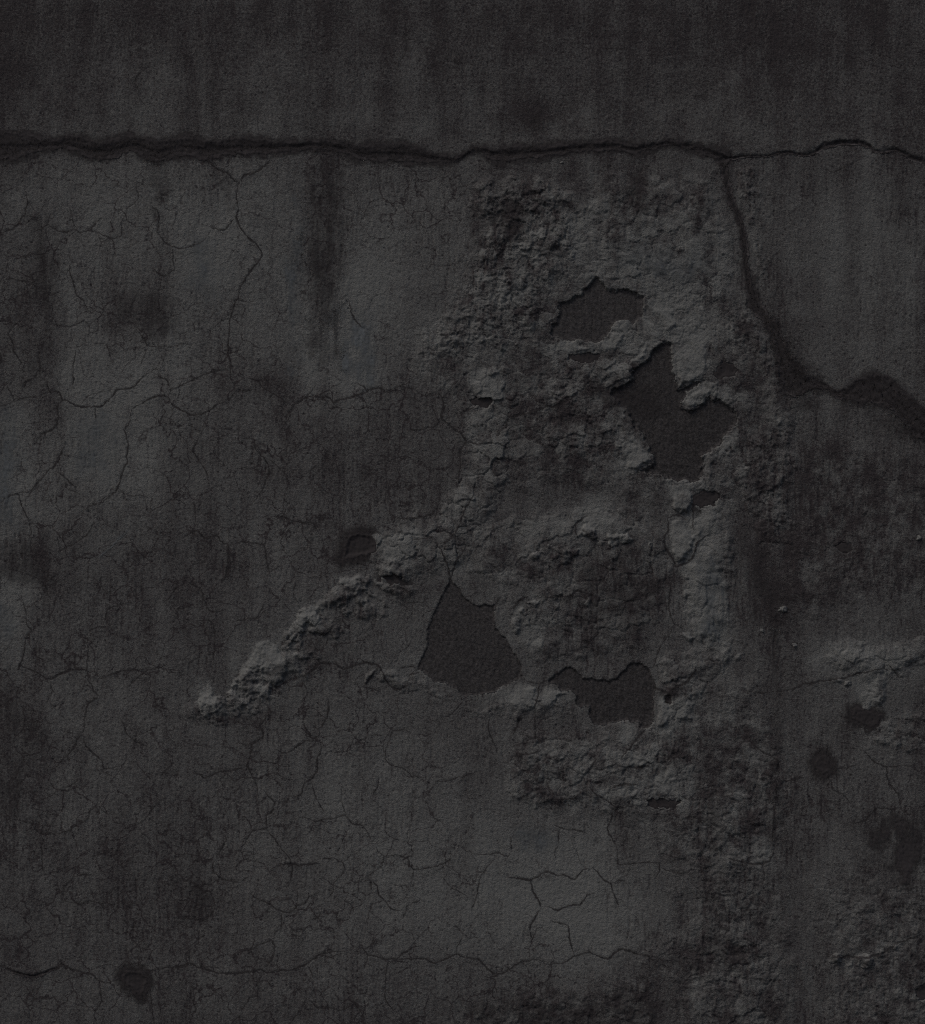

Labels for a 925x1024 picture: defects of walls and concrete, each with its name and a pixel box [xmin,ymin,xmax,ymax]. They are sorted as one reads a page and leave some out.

crack [0,135,925,788]
spalling [418,579,522,697]
flaking render [395,169,925,633]
crack [0,662,682,1024]
flaking render [448,662,925,1024]